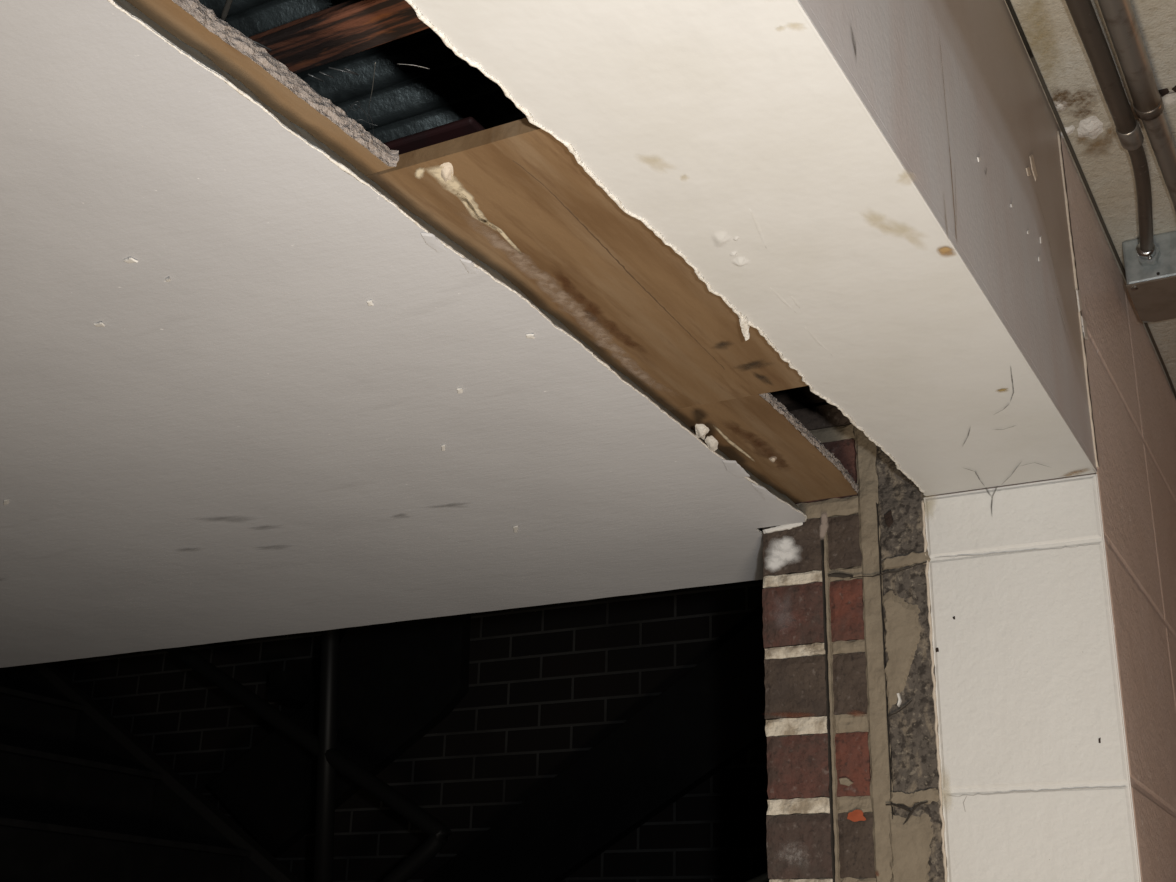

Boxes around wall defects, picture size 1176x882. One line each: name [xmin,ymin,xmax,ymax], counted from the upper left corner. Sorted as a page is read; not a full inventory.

spalling [172,0,399,166]
crack [1158,86,1176,97]
peeling [421,233,447,252]
peeling [460,258,479,273]
peeling [739,315,750,341]
spalling [759,393,859,493]
peeling [722,460,777,500]
water stain [767,538,793,570]